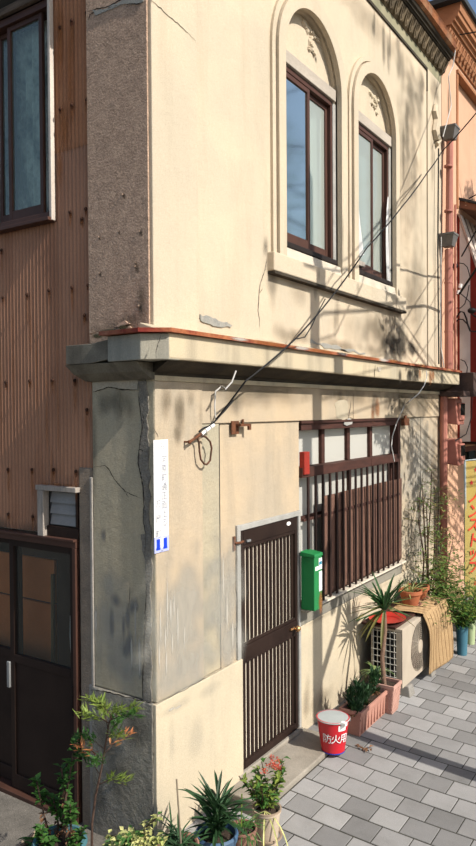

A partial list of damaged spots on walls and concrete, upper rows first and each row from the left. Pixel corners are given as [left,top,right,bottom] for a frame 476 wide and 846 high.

crack [87,0,196,41]
water stain [382,330,415,356]
crack [95,380,238,768]